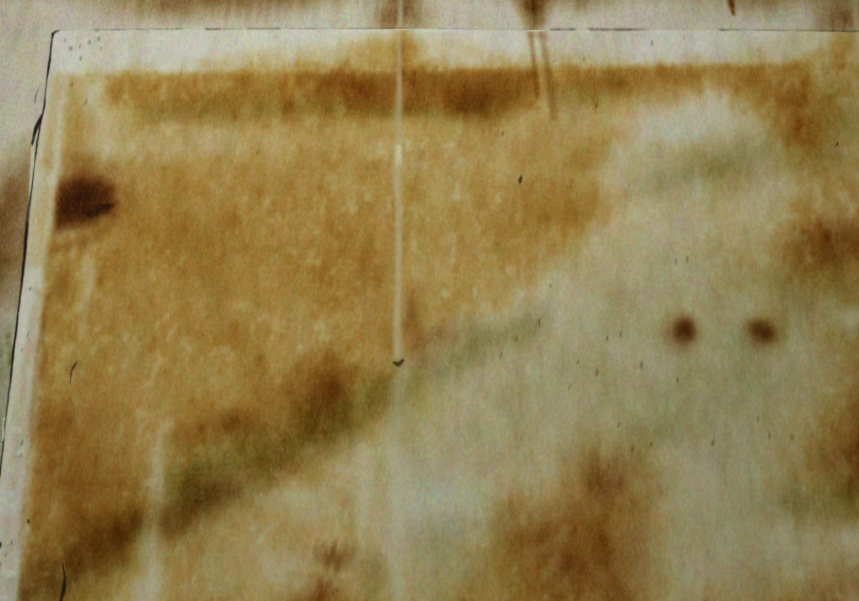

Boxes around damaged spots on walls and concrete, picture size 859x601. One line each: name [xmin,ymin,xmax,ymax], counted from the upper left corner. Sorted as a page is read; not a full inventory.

corrosion [57,176,115,227]
corrosion [675,321,693,341]
corrosion [752,323,772,340]